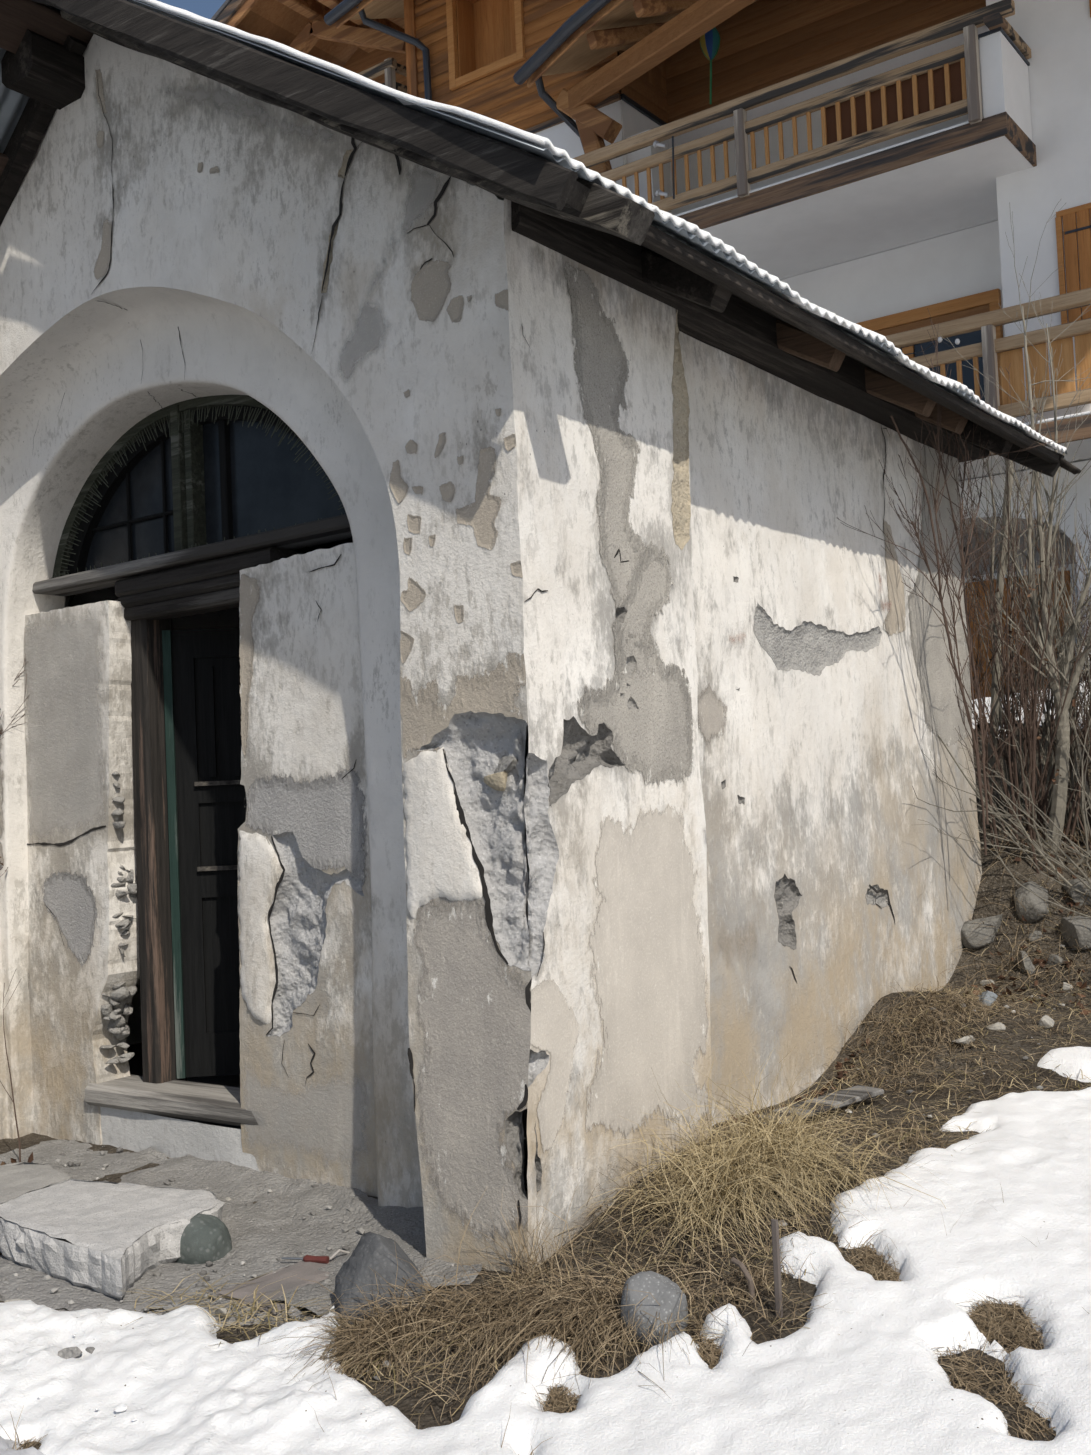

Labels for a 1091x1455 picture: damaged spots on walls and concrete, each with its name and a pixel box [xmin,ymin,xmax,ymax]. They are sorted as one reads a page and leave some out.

crack [312,137,401,351]
crack [407,176,454,269]
peeling [239,574,259,756]
peeling [389,261,727,1242]
peeling [753,445,972,746]
peeling [42,871,97,966]
peeling [239,769,367,1037]
crack [443,749,545,1012]
flaking render [774,874,802,950]
flaking render [865,884,890,908]
crack [517,1084,528,1110]
crack [515,1200,523,1227]